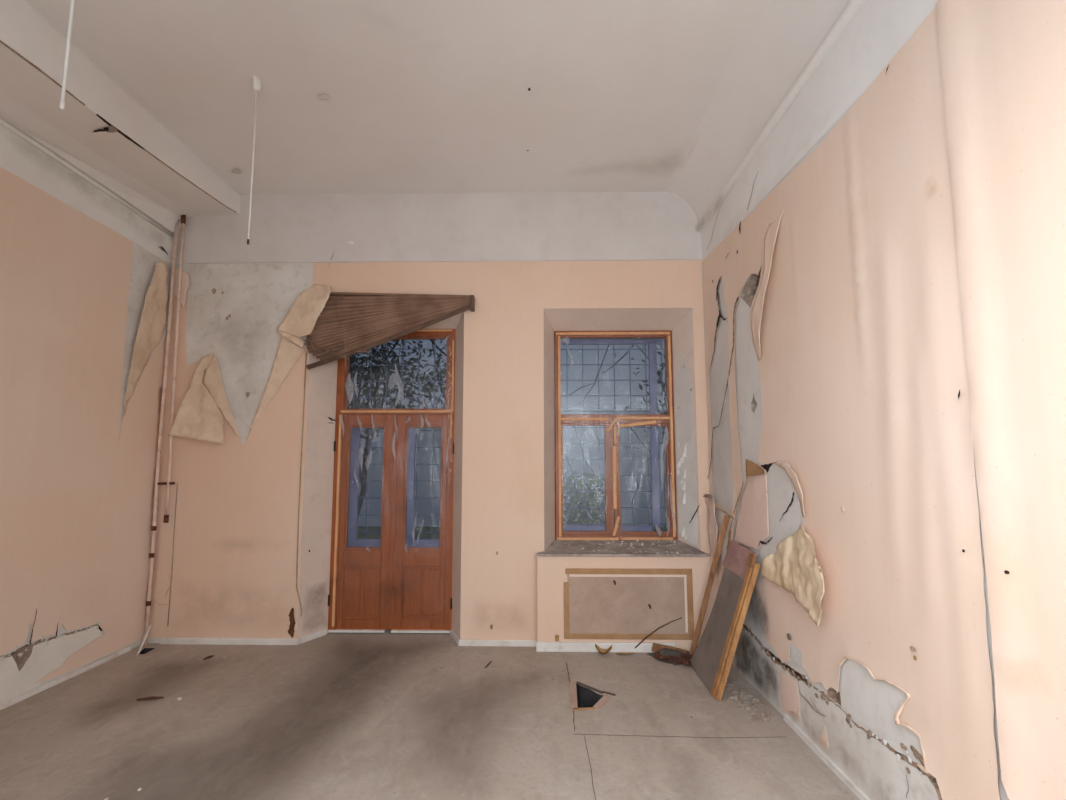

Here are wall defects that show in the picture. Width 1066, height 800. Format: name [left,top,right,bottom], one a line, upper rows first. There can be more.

peeling [119,240,171,435]
peeling [186,263,313,446]
peeling [710,268,803,580]
crack [0,608,100,661]
peeling [0,626,103,704]
spalling [569,681,611,710]
peeling [735,629,942,800]
crack [742,624,936,779]